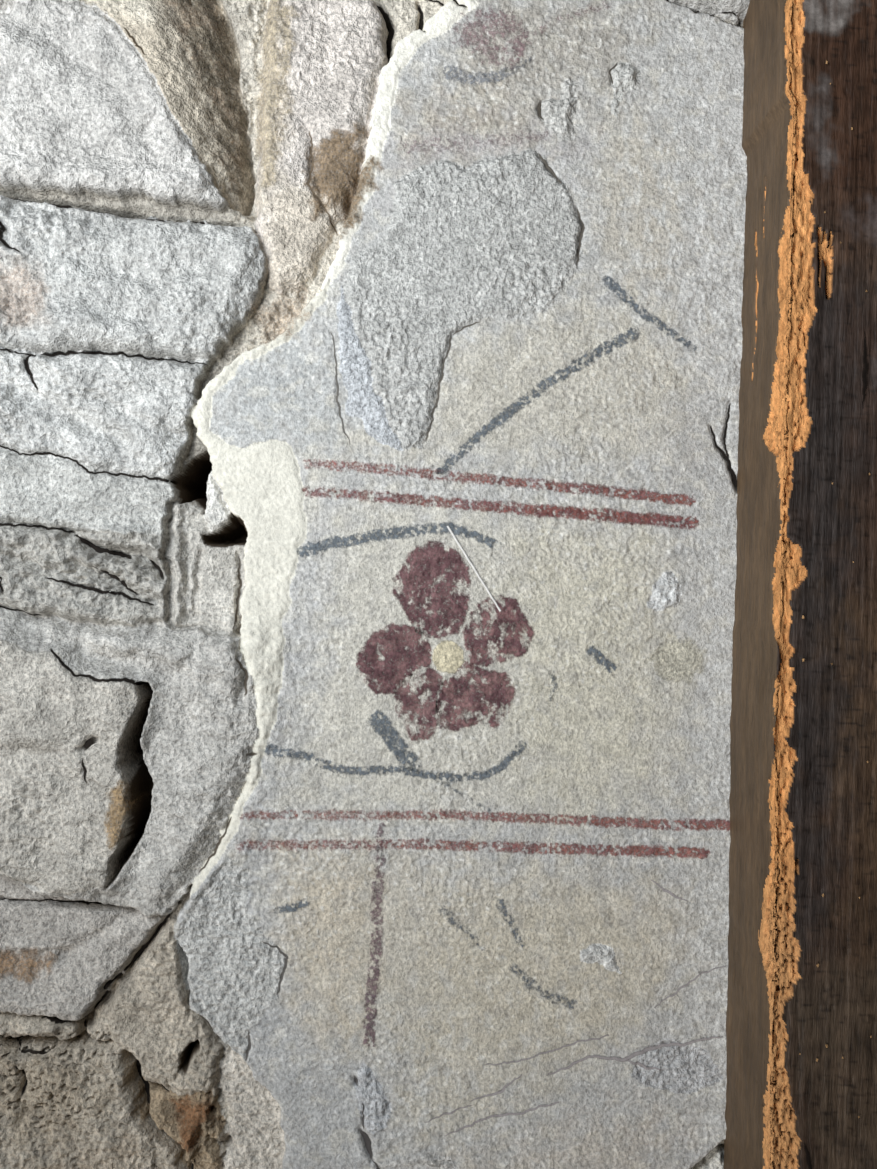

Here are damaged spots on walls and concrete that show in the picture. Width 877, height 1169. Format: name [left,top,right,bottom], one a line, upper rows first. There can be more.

damp [170,0,293,194]
damp [304,124,381,237]
spalling [0,640,153,895]
spalling [175,857,288,1066]
spalling [138,1076,227,1169]